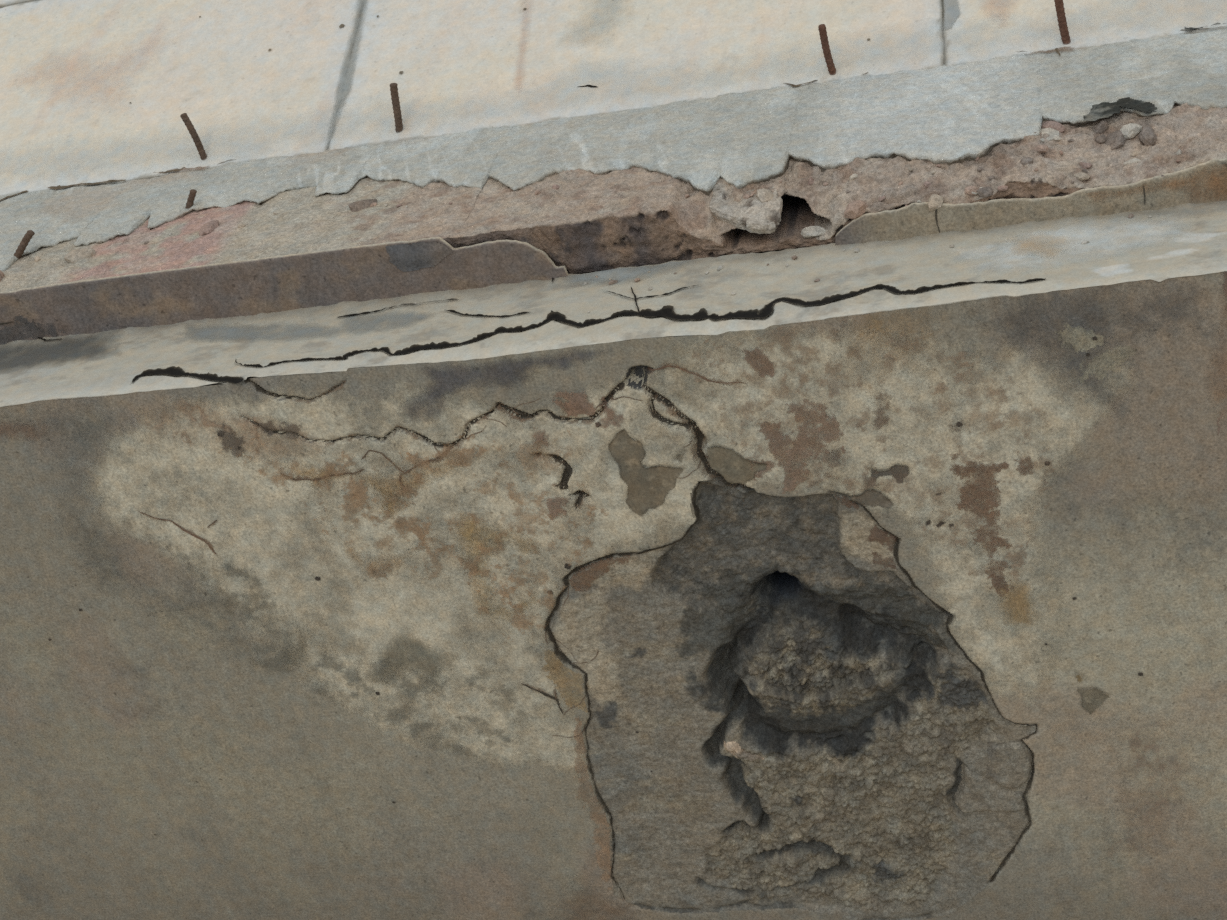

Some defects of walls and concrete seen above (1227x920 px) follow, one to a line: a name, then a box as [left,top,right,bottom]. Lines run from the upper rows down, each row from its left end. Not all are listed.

spalling [336,0,379,107]
spalling [0,103,1227,292]
crack [132,278,1046,899]
damp [96,293,1129,769]
flaking render [547,447,1036,920]